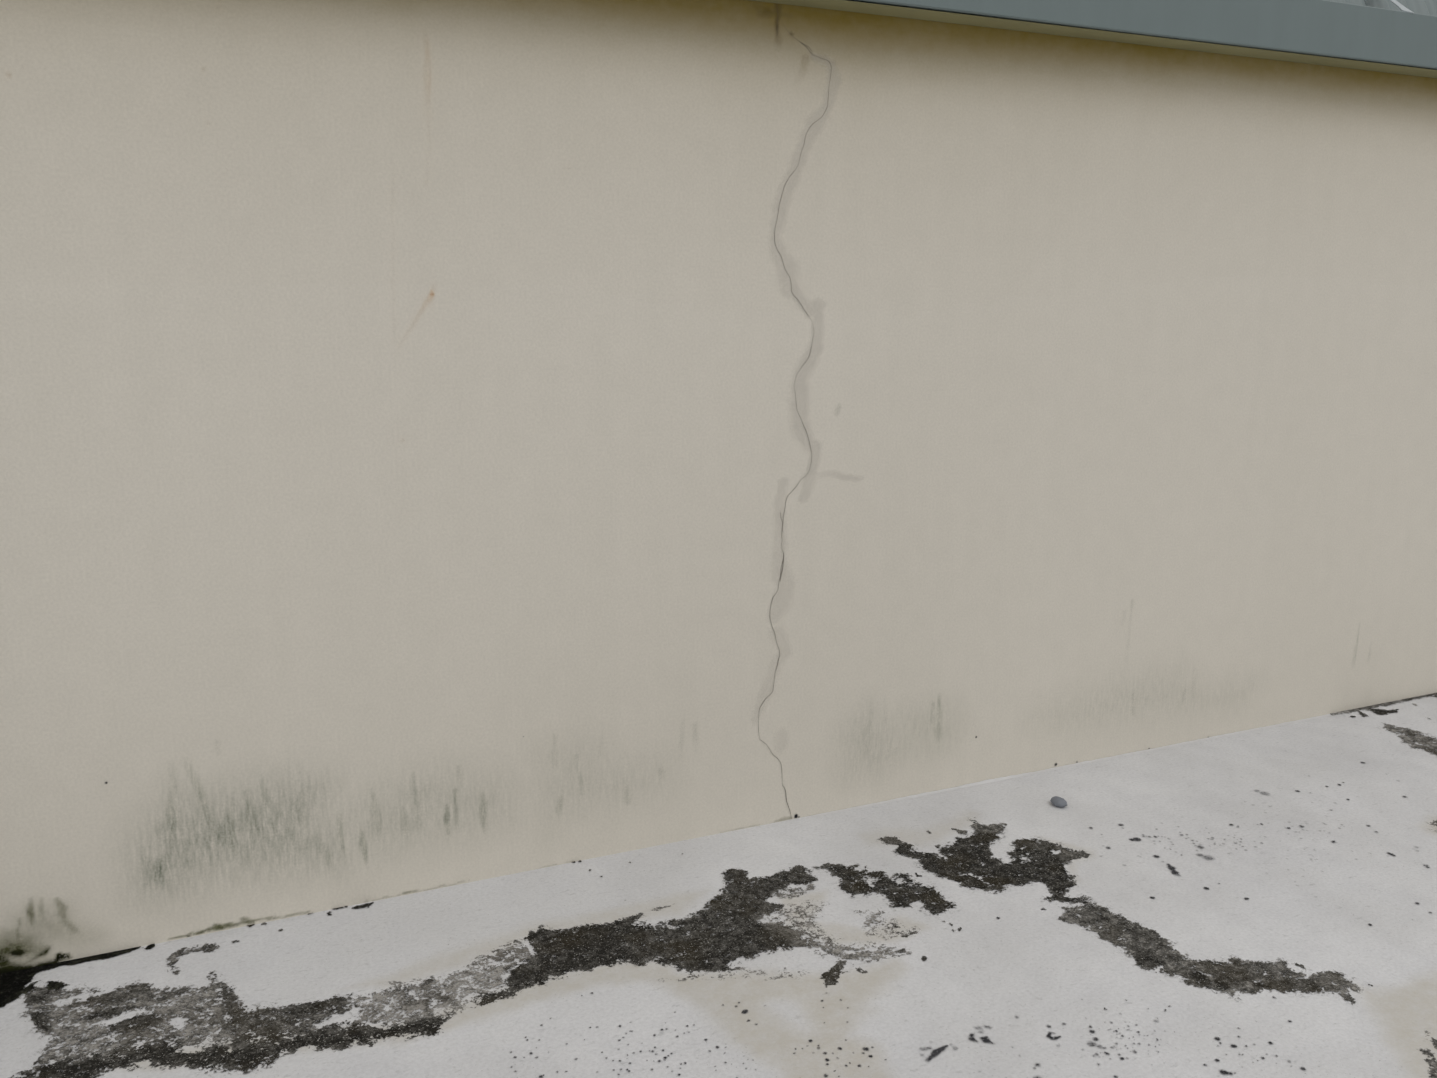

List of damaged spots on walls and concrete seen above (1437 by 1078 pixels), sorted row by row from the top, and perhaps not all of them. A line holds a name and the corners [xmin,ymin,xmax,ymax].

water stain [94,713,692,931]
peeling [1330,693,1437,755]
peeling [10,817,1373,1078]